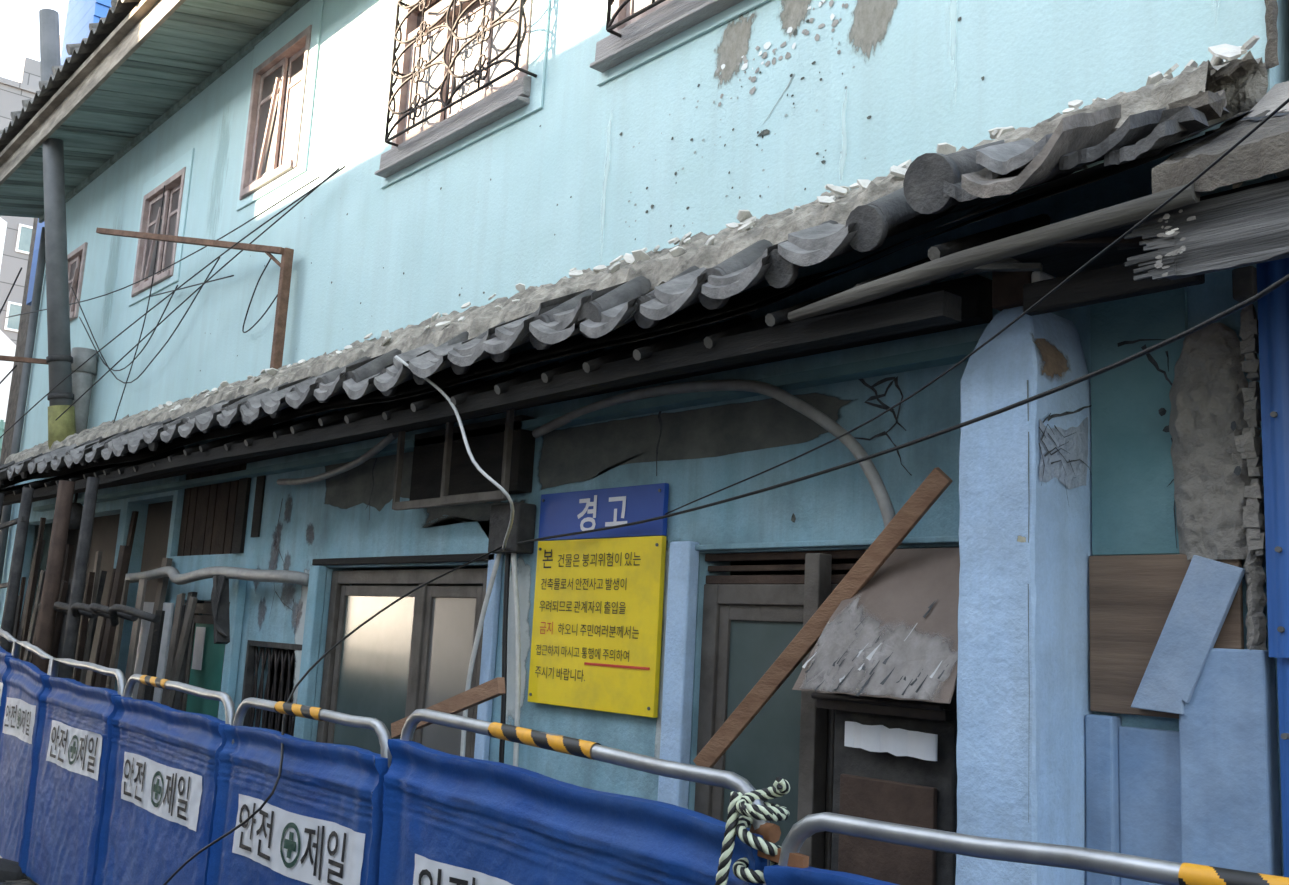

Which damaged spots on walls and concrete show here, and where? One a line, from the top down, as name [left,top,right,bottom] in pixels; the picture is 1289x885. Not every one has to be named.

peeling [682,0,848,158]
spalling [936,35,1268,202]
peeling [1154,210,1196,277]
spalling [4,159,912,465]
spalling [1032,335,1069,379]
crack [1117,339,1172,386]
peeling [324,452,413,512]
peeling [538,393,853,490]
crack [854,376,912,476]
crack [1027,380,1092,543]
peeling [293,570,310,704]
crack [1024,584,1032,654]